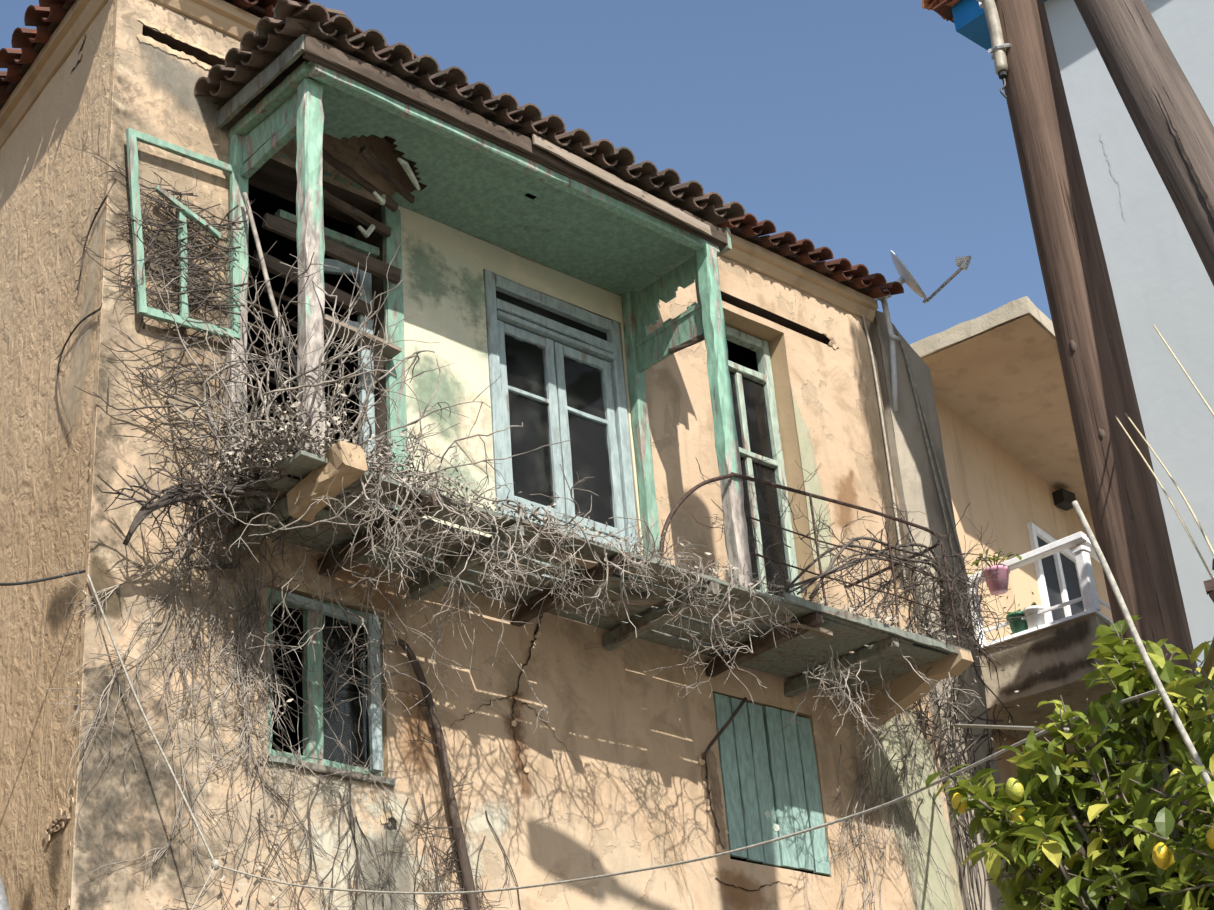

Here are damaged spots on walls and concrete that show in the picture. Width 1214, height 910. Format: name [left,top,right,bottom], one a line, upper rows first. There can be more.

damp [51,838,59,879]
damp [76,660,204,910]
crack [443,614,583,807]